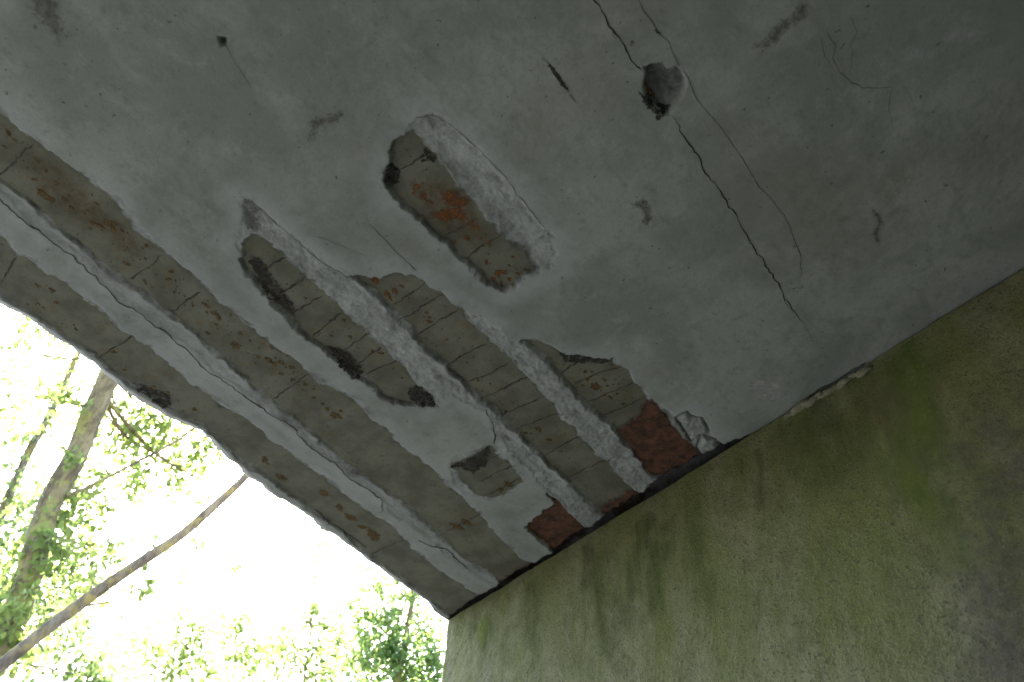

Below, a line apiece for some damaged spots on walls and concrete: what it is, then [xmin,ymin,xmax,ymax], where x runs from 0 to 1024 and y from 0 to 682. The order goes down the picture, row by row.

crack [593,0,641,70]
spalling [643,61,689,117]
crack [638,0,813,340]
crack [238,197,415,279]
corrosion [412,179,528,286]
crack [0,199,383,514]
spalling [0,105,725,618]
spalling [783,362,873,420]
crack [315,509,366,548]
crack [418,540,468,569]